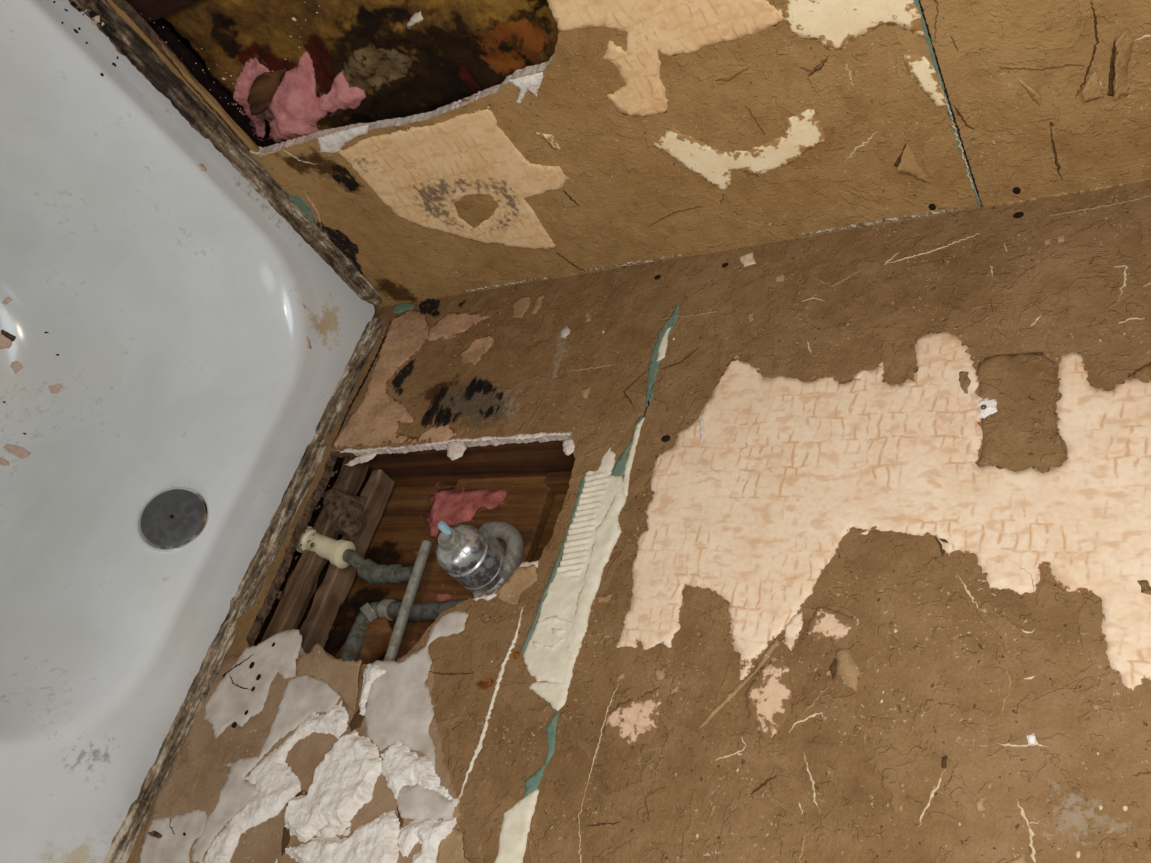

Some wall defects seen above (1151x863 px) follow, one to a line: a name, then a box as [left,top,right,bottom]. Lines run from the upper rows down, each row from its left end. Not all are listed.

water stain [207,10,296,77]
water stain [304,0,550,128]
peeling [547,0,925,117]
crack [999,2,1099,96]
peeling [317,106,569,250]
peeling [653,109,826,191]
crack [1050,122,1063,180]
water stain [392,359,415,395]
peeling [331,309,575,466]
water stain [421,377,510,427]
peeling [616,331,1151,740]
spalling [201,607,523,863]